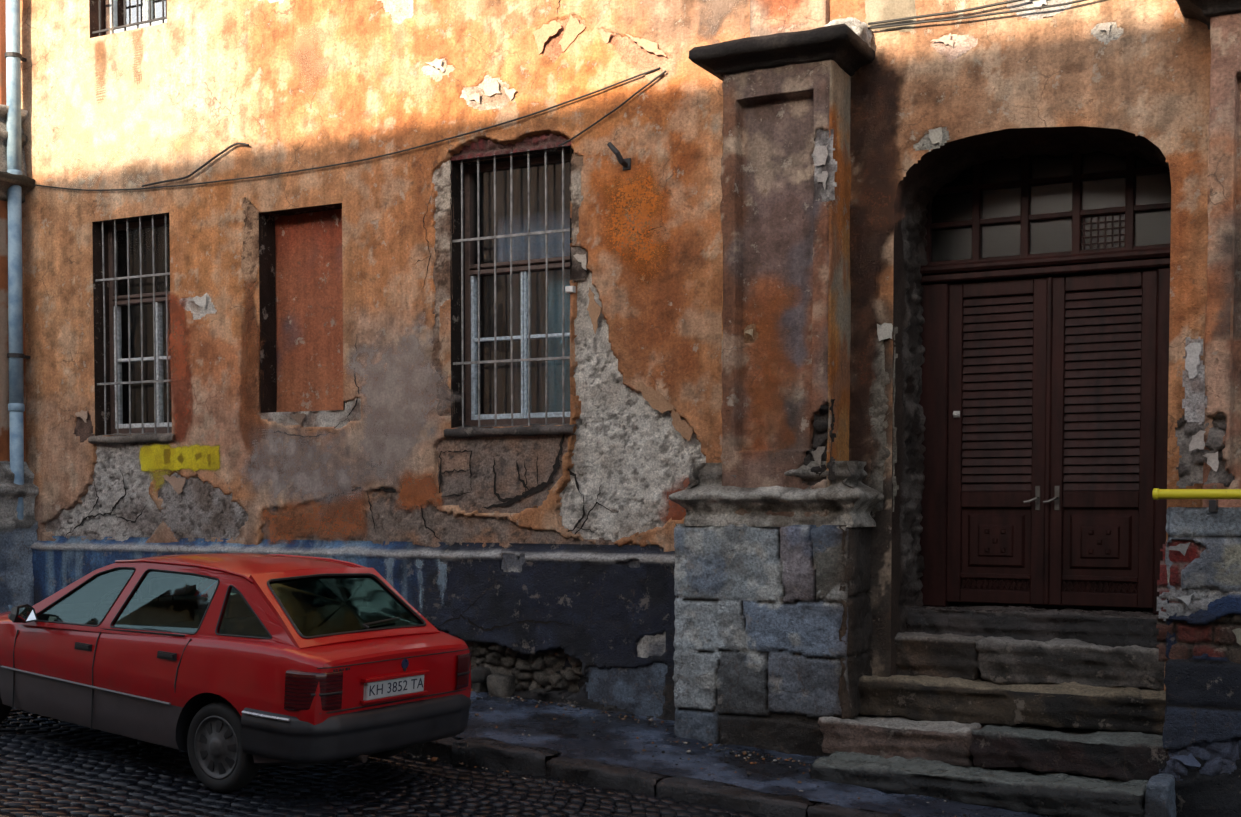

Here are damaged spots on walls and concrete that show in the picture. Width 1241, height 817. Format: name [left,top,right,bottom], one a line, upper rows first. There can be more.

peeling [377,0,413,25]
peeling [421,58,455,82]
peeling [460,74,517,111]
peeling [533,14,673,81]
peeling [812,128,837,202]
flaking render [261,133,706,572]
spalling [1175,337,1235,488]
flaking render [45,410,186,541]
damp [438,563,447,588]
flaking render [1156,540,1241,664]
spalling [433,625,583,698]
peeling [1159,737,1241,781]